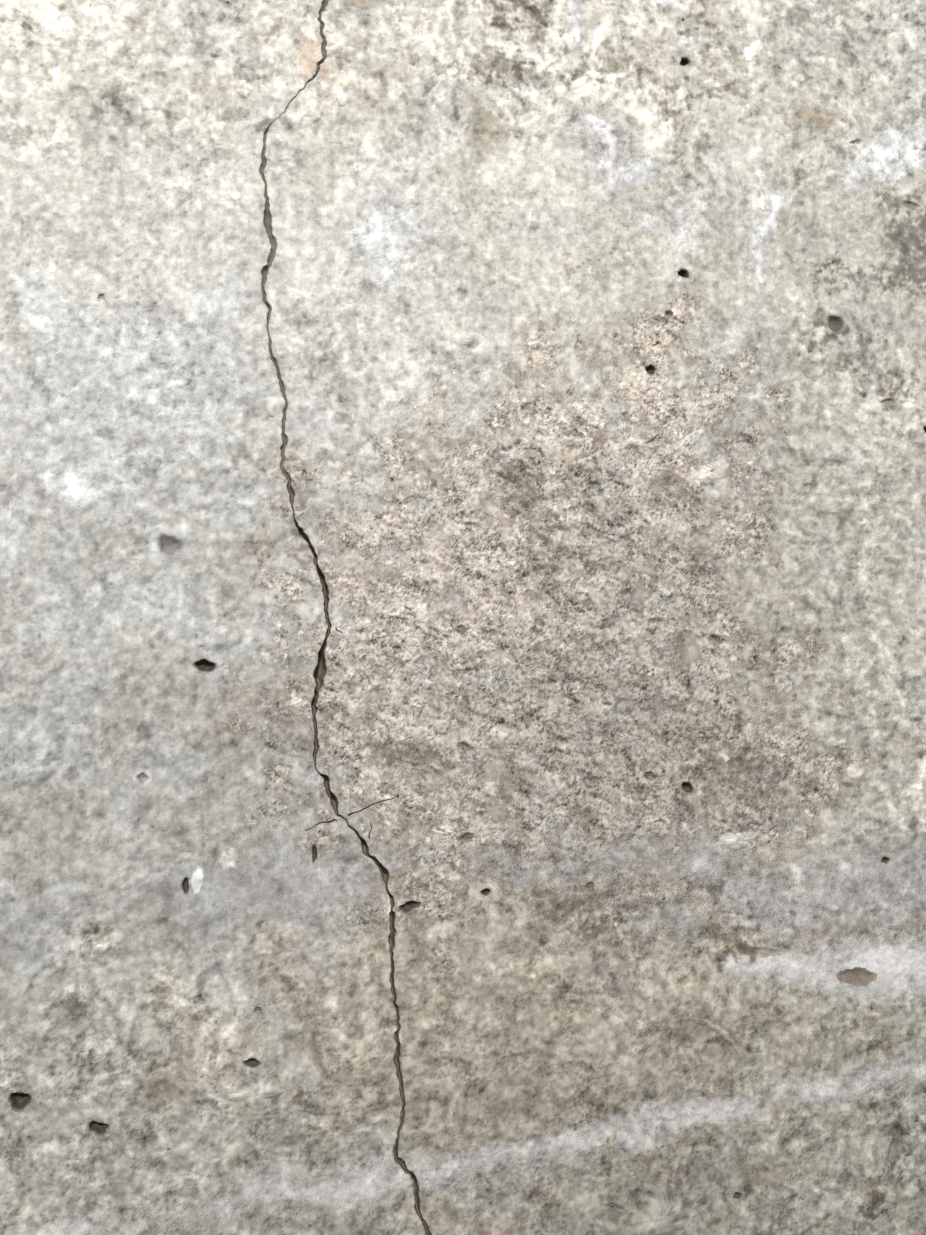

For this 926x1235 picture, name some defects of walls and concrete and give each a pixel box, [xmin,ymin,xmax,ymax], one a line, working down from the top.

crack [255,0,435,1235]